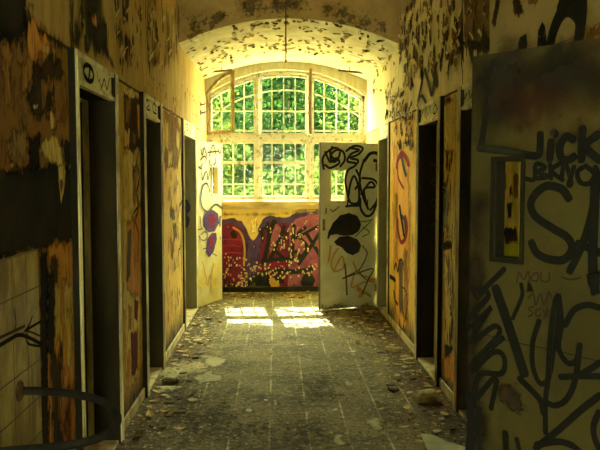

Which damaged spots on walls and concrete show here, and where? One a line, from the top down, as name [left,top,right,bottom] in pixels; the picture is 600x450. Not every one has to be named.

peeling [0,17,70,202]
peeling [114,0,180,92]
peeling [186,0,500,151]